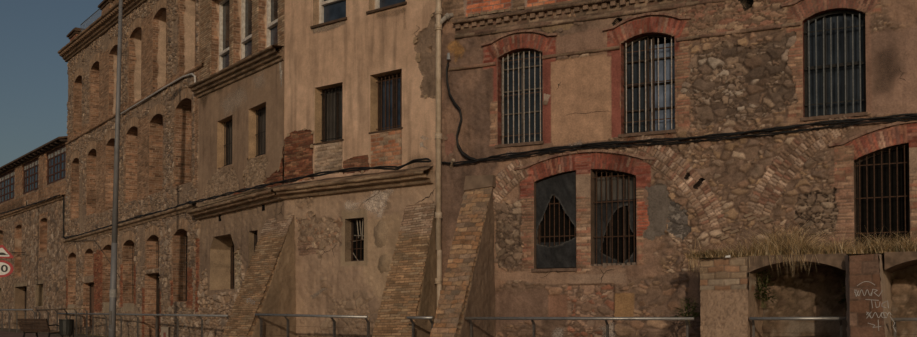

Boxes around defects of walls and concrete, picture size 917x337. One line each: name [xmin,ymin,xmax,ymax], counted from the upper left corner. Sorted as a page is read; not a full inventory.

spalling [738,0,754,11]
peeling [413,12,436,99]
flaking render [201,128,402,204]